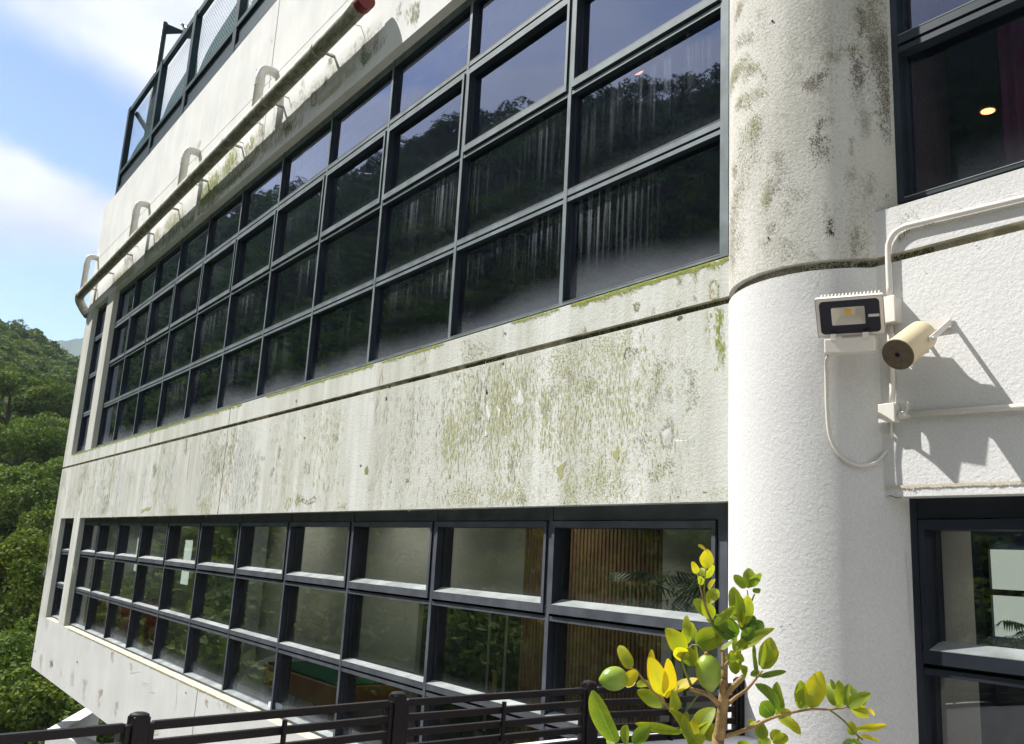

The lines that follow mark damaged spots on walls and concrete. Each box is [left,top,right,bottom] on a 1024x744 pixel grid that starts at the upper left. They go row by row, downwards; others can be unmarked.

mould [795,0,892,155]
mould [110,23,387,289]
mould [728,0,819,274]
mould [809,115,834,168]
mould [844,168,934,258]
damp [484,375,526,436]
mould [643,354,700,415]
damp [95,422,281,518]
damp [630,417,676,485]